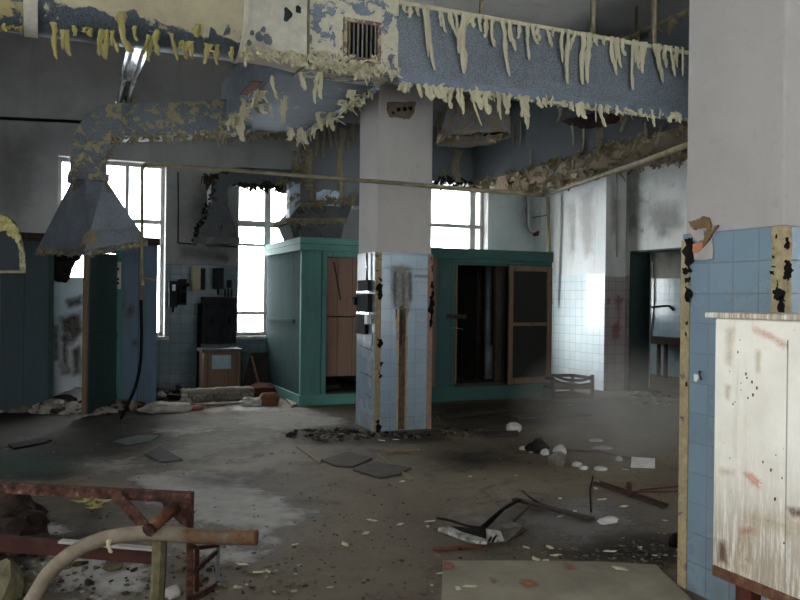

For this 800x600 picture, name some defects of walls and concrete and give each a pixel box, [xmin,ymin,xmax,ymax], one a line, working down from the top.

peeling [49,11,248,65]
peeling [402,5,684,90]
peeling [236,98,247,141]
peeling [258,71,347,206]
spalling [386,82,682,153]
peeling [0,218,23,252]
peeling [427,257,435,329]
spalling [681,216,719,303]
peeling [769,234,794,313]
peeling [395,306,409,430]